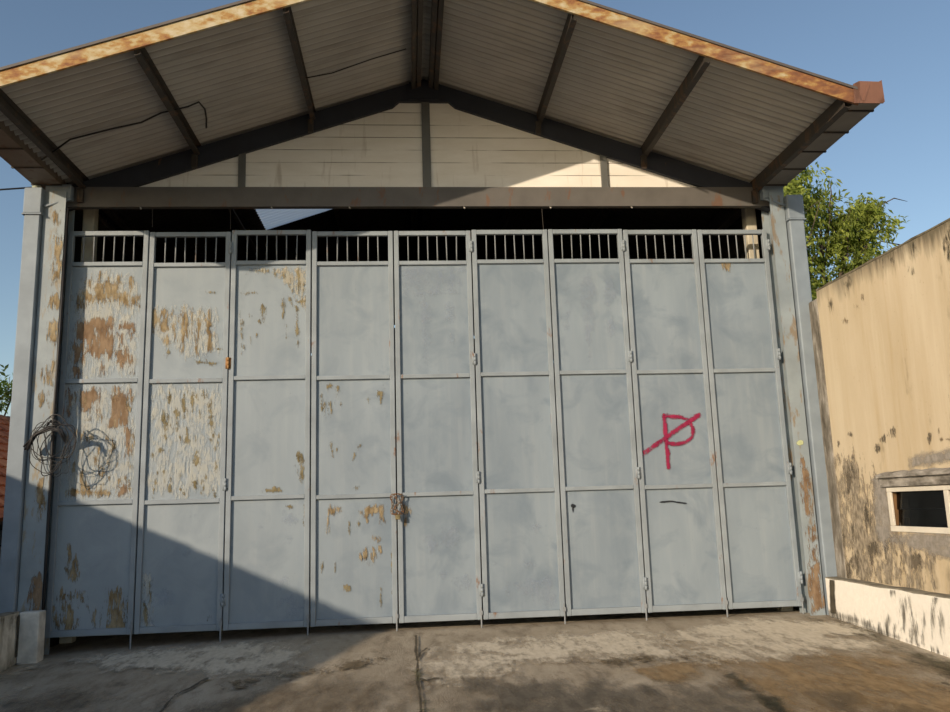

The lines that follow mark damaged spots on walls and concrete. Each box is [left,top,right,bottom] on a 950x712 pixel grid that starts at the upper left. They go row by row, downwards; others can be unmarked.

peeling [64,271,140,500]
peeling [142,383,222,499]
peeling [154,304,221,366]
corrosion [799,457,825,614]
crack [414,635,439,712]
leakage [465,597,950,712]